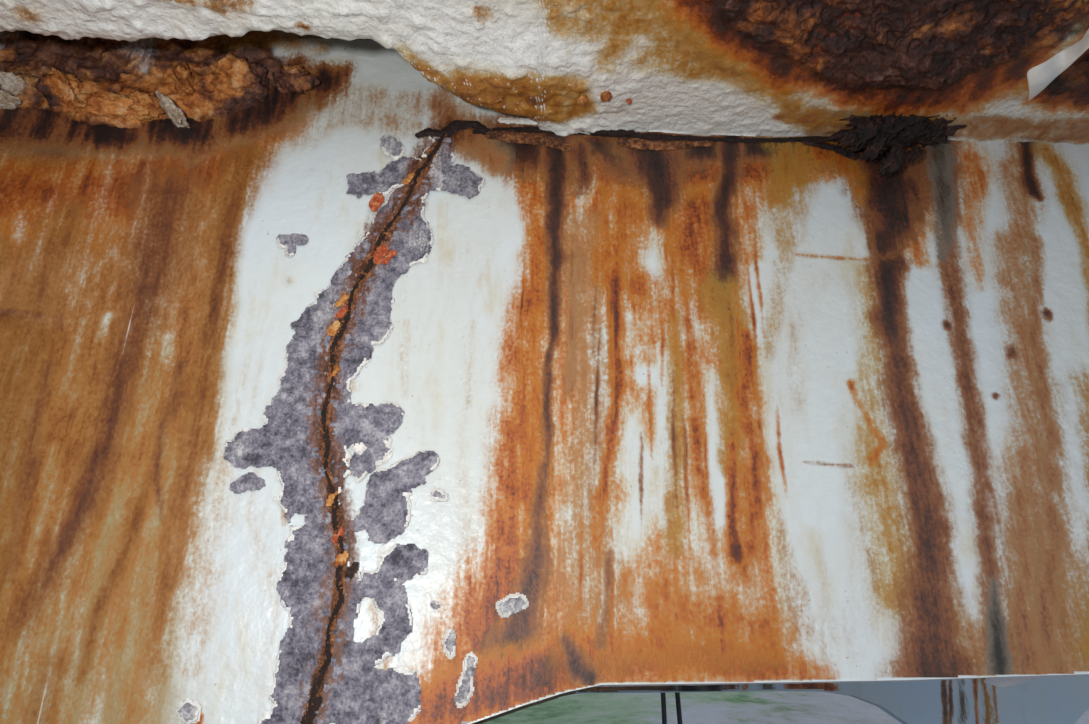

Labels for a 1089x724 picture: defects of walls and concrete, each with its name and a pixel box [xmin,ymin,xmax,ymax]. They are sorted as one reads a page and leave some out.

rust [0,92,321,724]
spalling [0,30,353,165]
peeling [223,134,485,724]
rust [366,90,398,130]
peeling [496,593,529,618]
crack [300,117,860,724]
rust [399,0,1089,724]
spalling [657,0,1089,120]